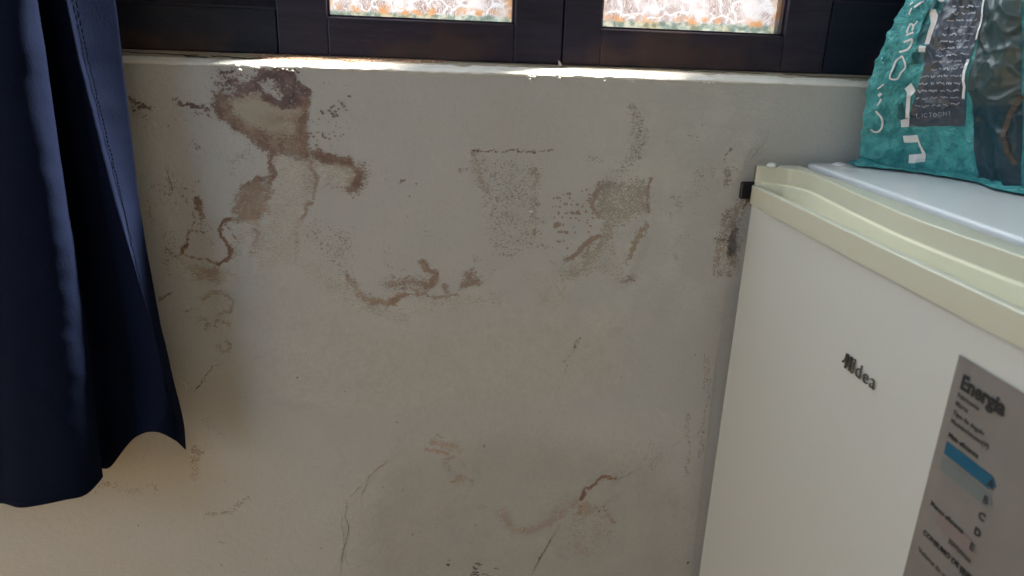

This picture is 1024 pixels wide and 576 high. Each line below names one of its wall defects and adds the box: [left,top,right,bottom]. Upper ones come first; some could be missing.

water stain [172,68,657,313]
water stain [713,199,751,281]